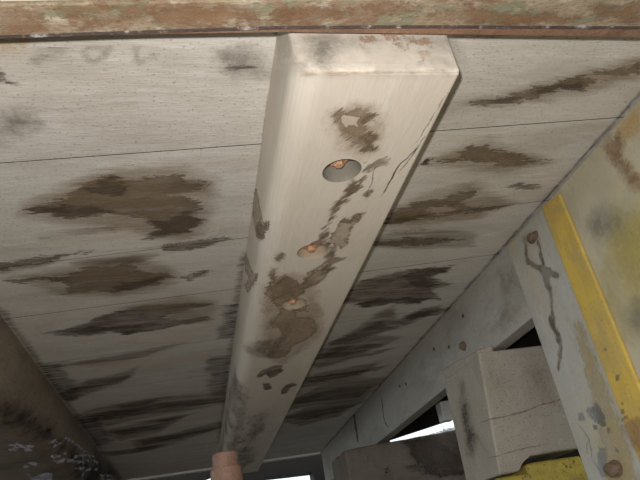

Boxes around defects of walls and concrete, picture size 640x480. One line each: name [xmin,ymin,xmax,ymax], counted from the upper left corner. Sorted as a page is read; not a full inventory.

water stain [469,60,640,110]
water stain [421,144,550,167]
water stain [23,174,229,251]
water stain [374,189,504,248]
water stain [0,250,172,293]
water stain [56,303,211,337]
water stain [314,265,451,366]